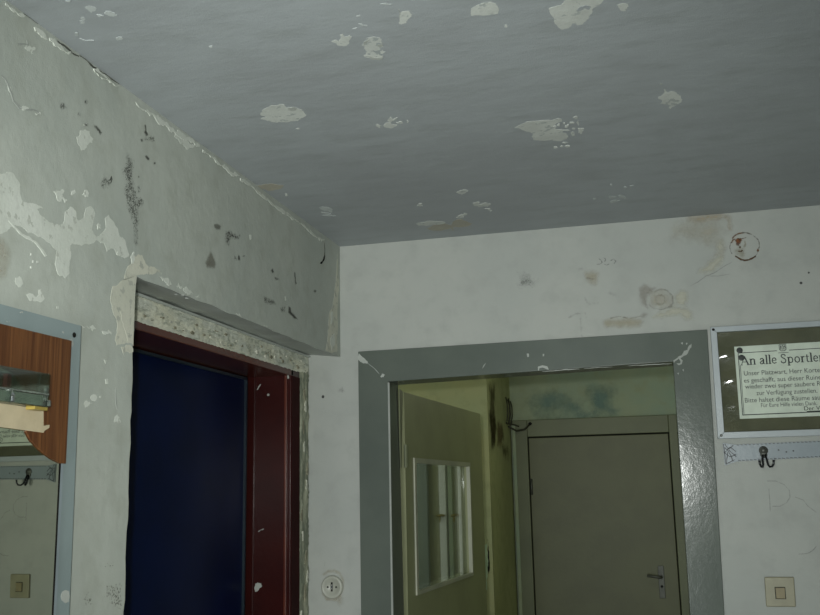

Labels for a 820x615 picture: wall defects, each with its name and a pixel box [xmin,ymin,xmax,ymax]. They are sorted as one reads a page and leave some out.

peeling [471,2,499,16]
peeling [549,0,603,30]
peeling [362,37,384,60]
peeling [260,104,306,129]
peeling [77,123,93,150]
peeling [515,116,584,149]
corrosion [731,232,760,261]
peeling [631,342,692,374]
peeling [0,172,310,615]
leakage [489,389,506,453]